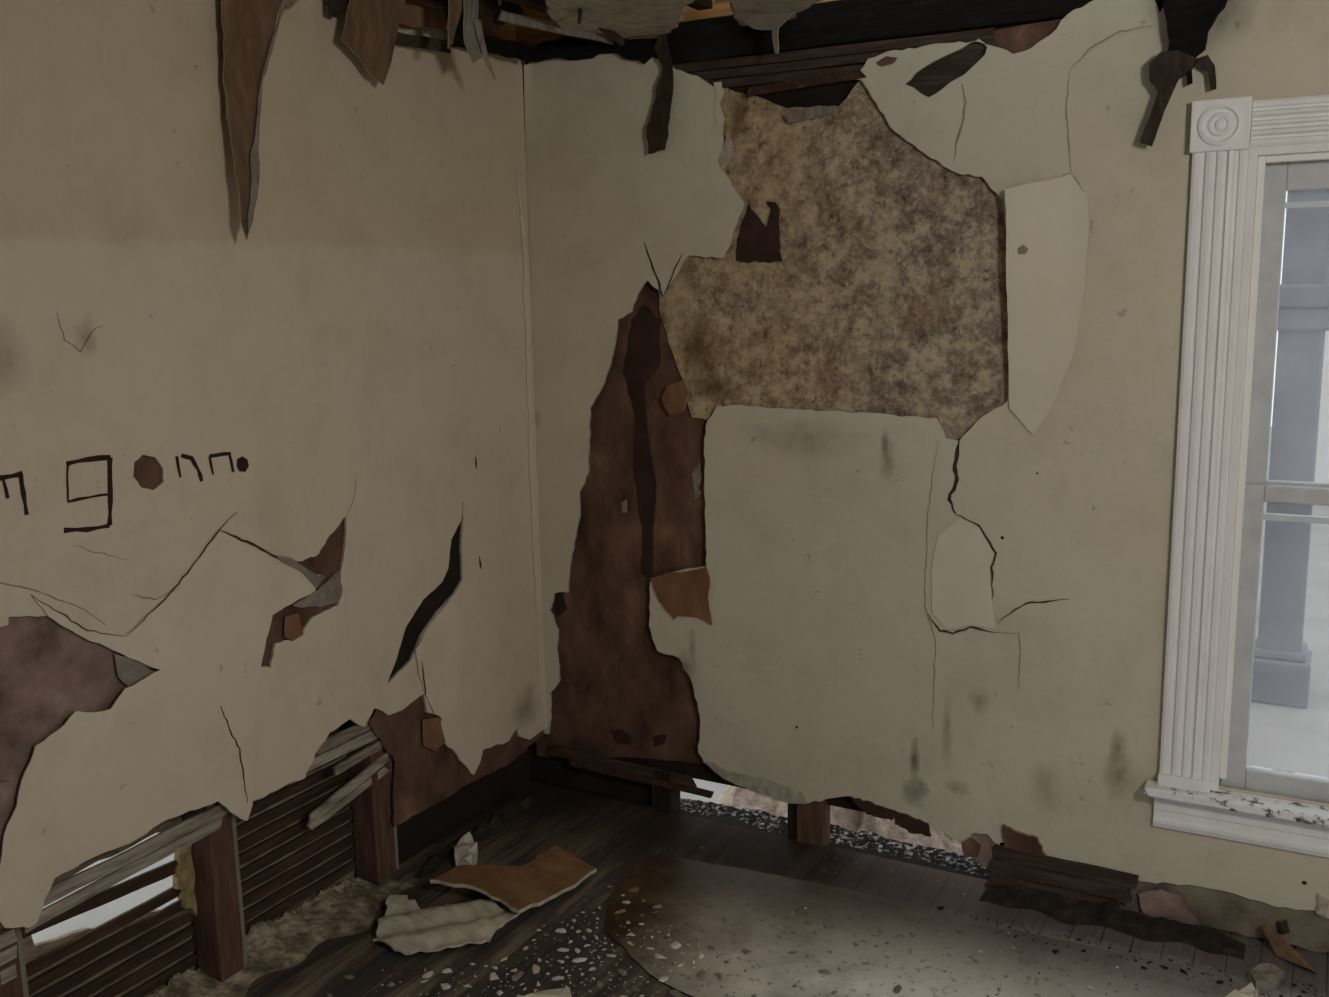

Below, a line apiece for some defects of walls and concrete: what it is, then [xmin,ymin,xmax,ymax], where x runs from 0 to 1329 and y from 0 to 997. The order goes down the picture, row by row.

crack [0,582,106,625]
flaking render [0,476,357,928]
crack [389,502,482,719]
spalling [368,80,1090,865]
crack [924,439,1063,731]
spalling [1117,880,1329,953]